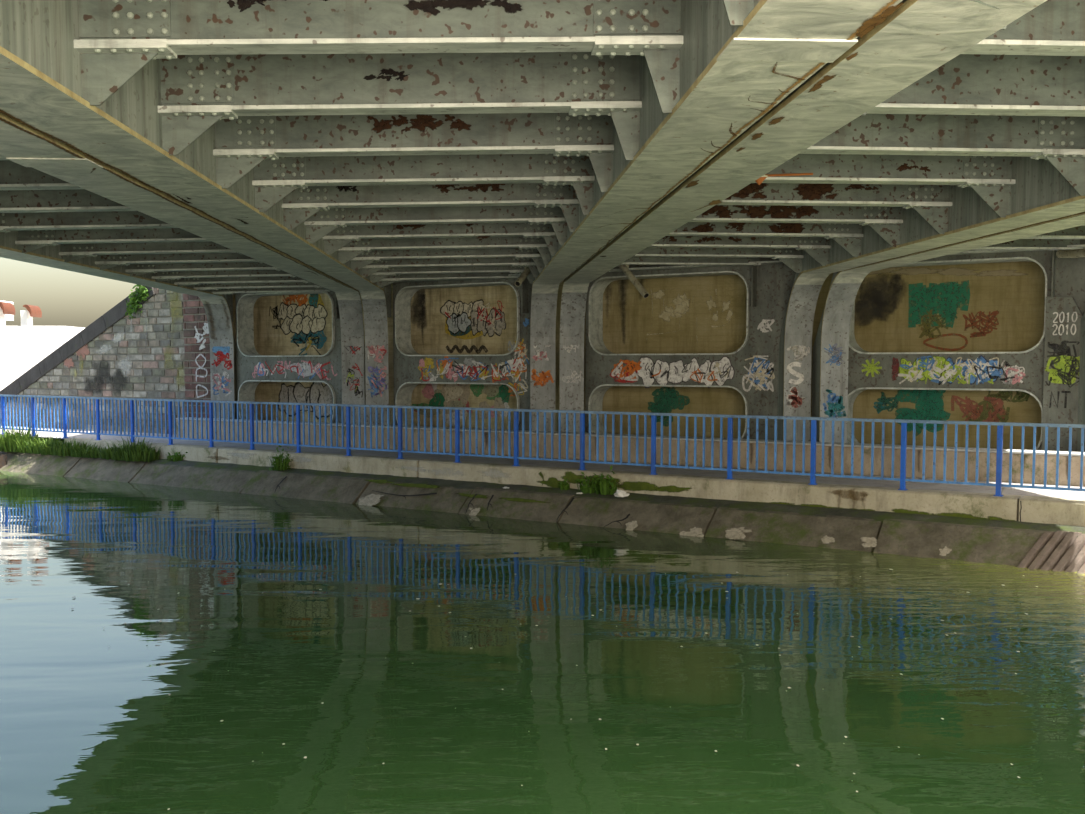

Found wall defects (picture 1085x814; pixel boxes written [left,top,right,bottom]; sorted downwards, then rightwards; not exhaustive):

corrosion [847,0,904,40]
corrosion [366,114,471,133]
corrosion [0,110,354,288]
corrosion [561,62,836,282]
corrosion [662,183,879,243]